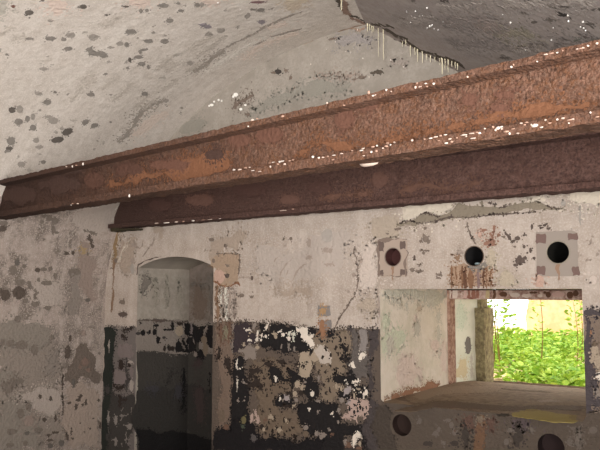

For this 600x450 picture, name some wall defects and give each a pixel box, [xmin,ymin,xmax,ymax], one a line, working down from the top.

damp [384,0,600,68]
damp [0,0,315,173]
corrosion [2,174,83,208]
corrosion [106,127,287,191]
spalling [386,198,567,274]
corrosion [474,228,499,250]
crack [332,246,370,330]
corrosion [444,245,579,299]
spalling [238,315,334,442]
spalling [330,379,371,424]
spalling [349,328,369,368]
spalling [343,431,363,450]